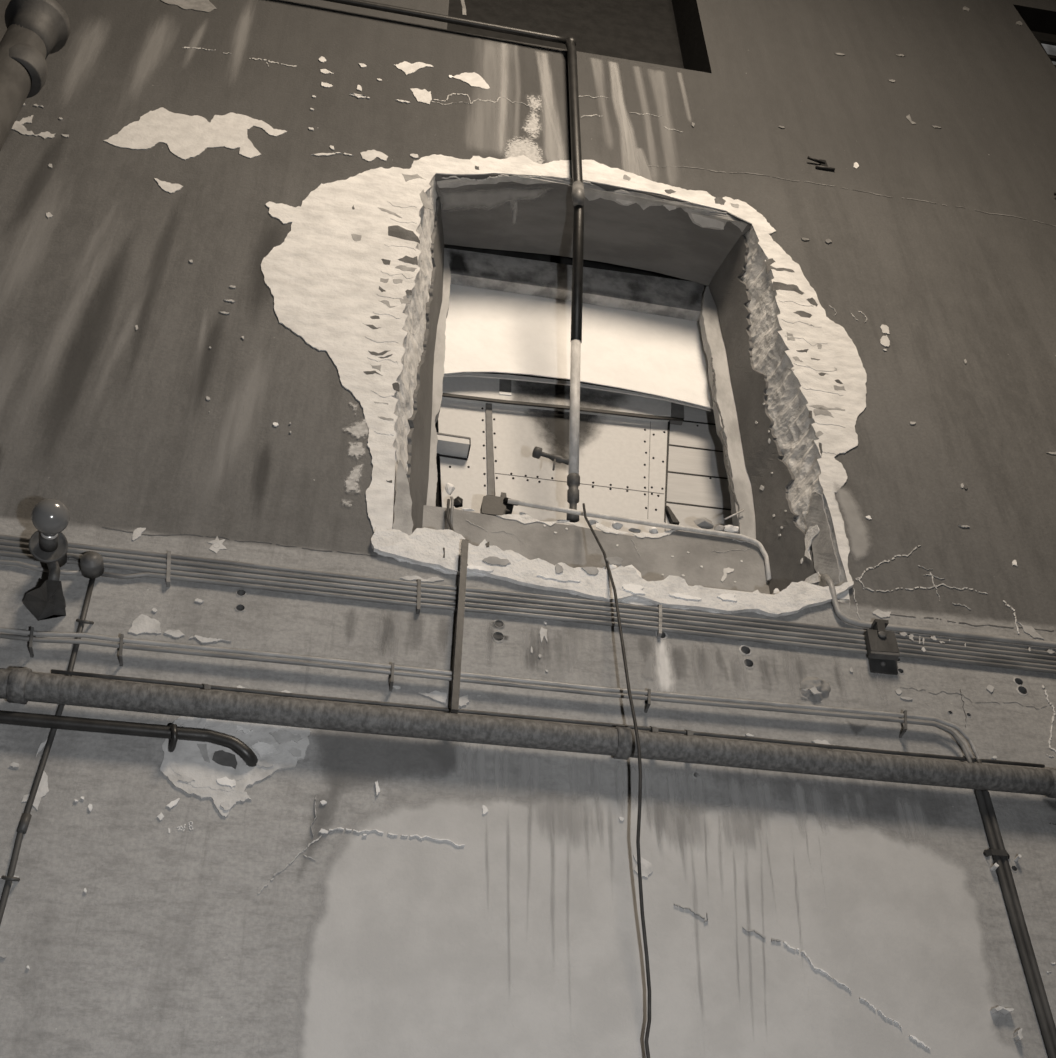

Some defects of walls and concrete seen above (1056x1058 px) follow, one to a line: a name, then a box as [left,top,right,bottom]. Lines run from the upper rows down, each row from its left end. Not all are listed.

peeling [161,0,217,13]
peeling [310,56,334,111]
peeling [103,107,287,160]
spalling [261,145,872,617]
crack [853,545,1054,634]
crack [901,685,1056,757]
spalling [157,716,311,820]
crack [258,797,465,894]
crack [674,904,709,923]
crack [742,927,930,1050]